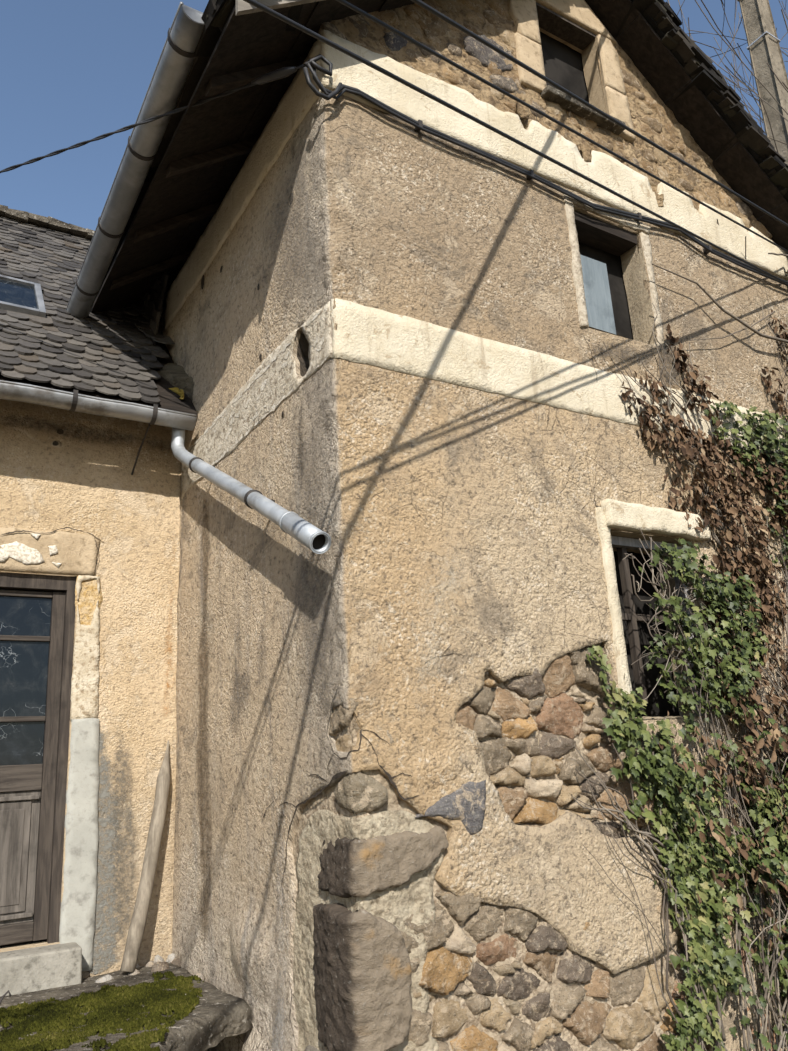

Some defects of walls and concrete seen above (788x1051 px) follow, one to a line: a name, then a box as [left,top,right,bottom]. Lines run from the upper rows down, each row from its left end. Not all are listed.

peeling [181,301,333,499]
peeling [0,533,61,568]
water stain [197,502,212,930]
crack [263,687,419,909]
flaking render [328,692,360,752]
flaking render [456,645,665,839]
flaking render [400,889,714,1051]